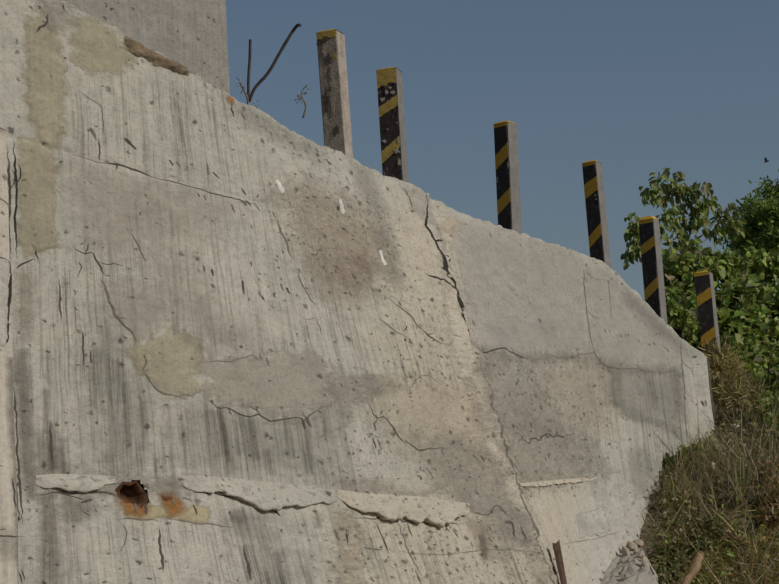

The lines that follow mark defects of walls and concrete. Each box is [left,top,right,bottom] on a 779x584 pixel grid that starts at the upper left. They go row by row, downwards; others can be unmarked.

crack [0,127,38,351]
crack [56,280,64,323]
crack [68,92,322,334]
crack [74,244,326,425]
crack [383,299,446,390]
crack [400,186,470,333]
crack [475,273,694,439]
crack [0,383,23,537]
crack [41,490,120,500]
rust [161,491,181,516]
crack [349,393,574,584]
spalling [429,358,598,584]